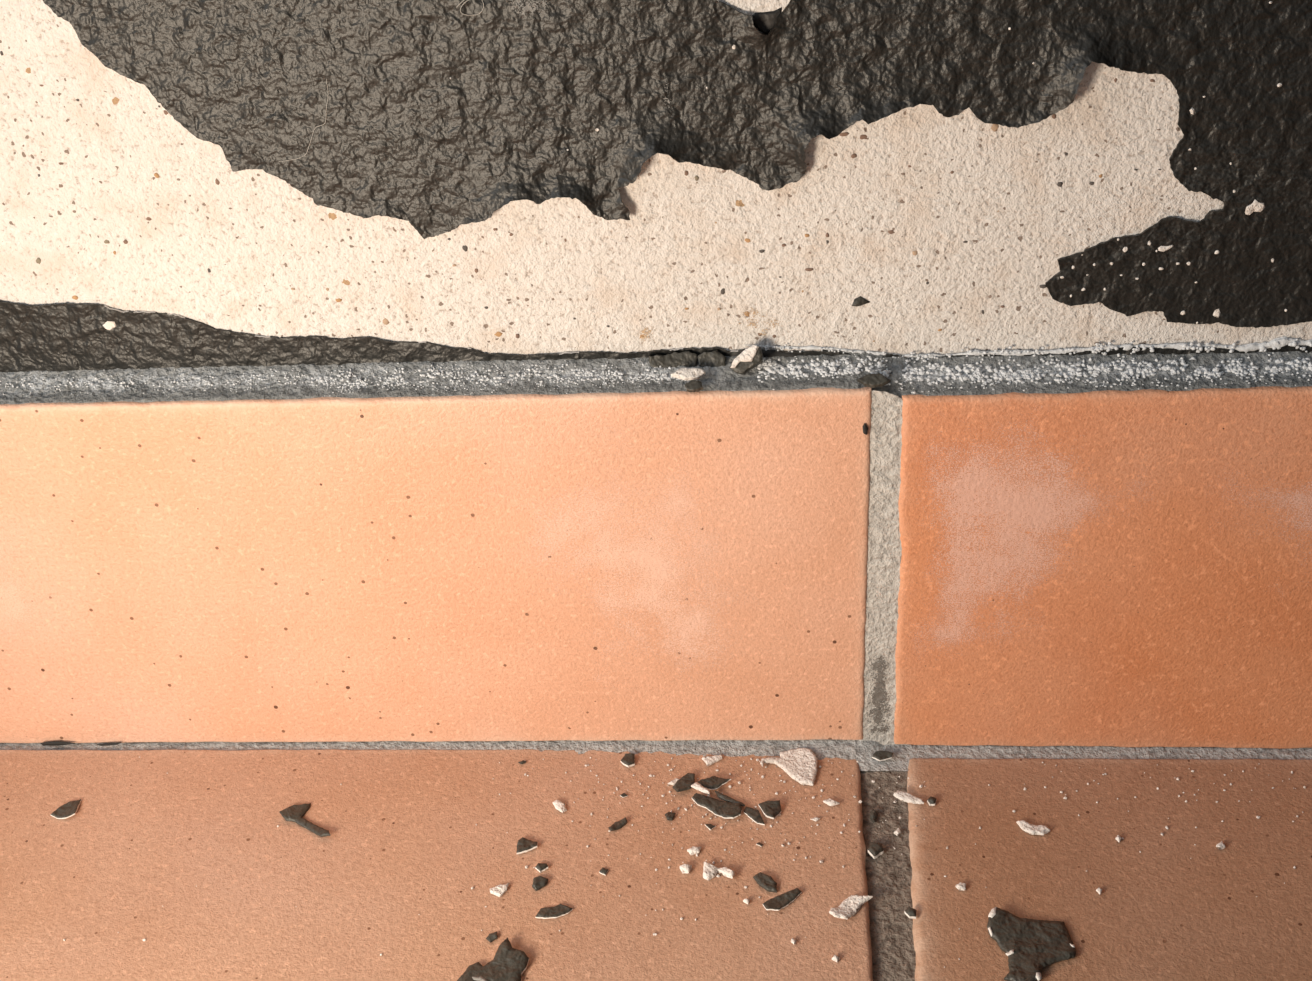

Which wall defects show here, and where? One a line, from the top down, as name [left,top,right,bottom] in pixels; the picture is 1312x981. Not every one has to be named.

peeling [0,0,1312,392]
leakage [464,422,786,707]
leakage [747,336,1312,671]